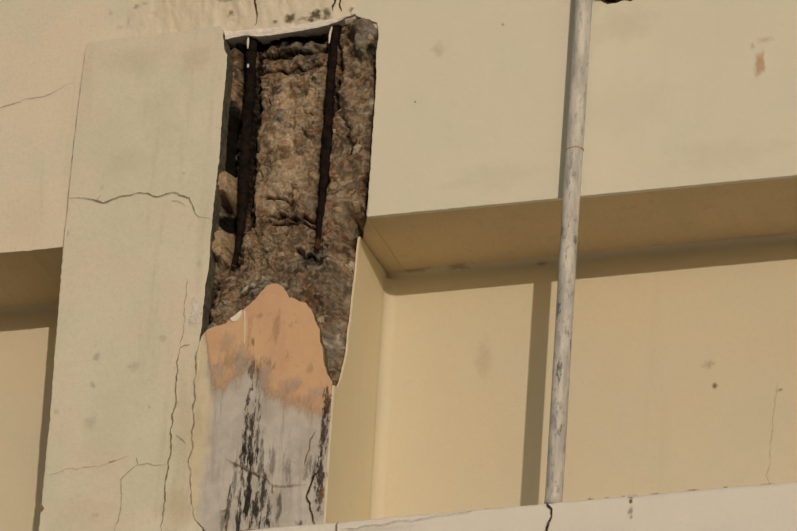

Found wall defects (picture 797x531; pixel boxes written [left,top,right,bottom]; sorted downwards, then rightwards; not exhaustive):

crack [74,192,199,217]
spalling [189,10,378,531]
crack [161,350,197,529]
leakage [225,388,274,531]
leakage [313,389,331,510]
crack [544,502,552,531]